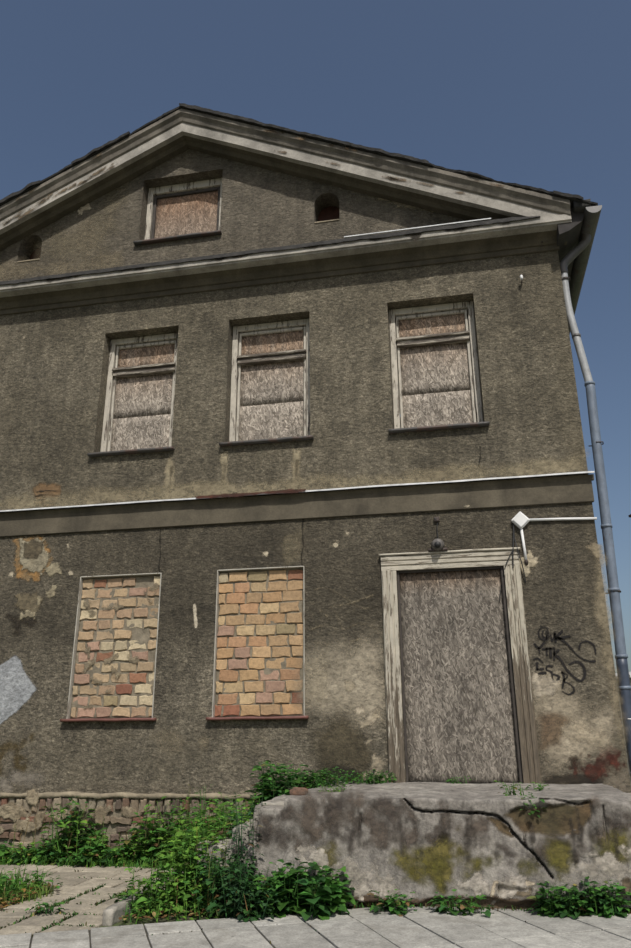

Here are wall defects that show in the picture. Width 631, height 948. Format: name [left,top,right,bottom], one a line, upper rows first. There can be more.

flaking render [6,535,73,635]
crack [409,803,553,877]